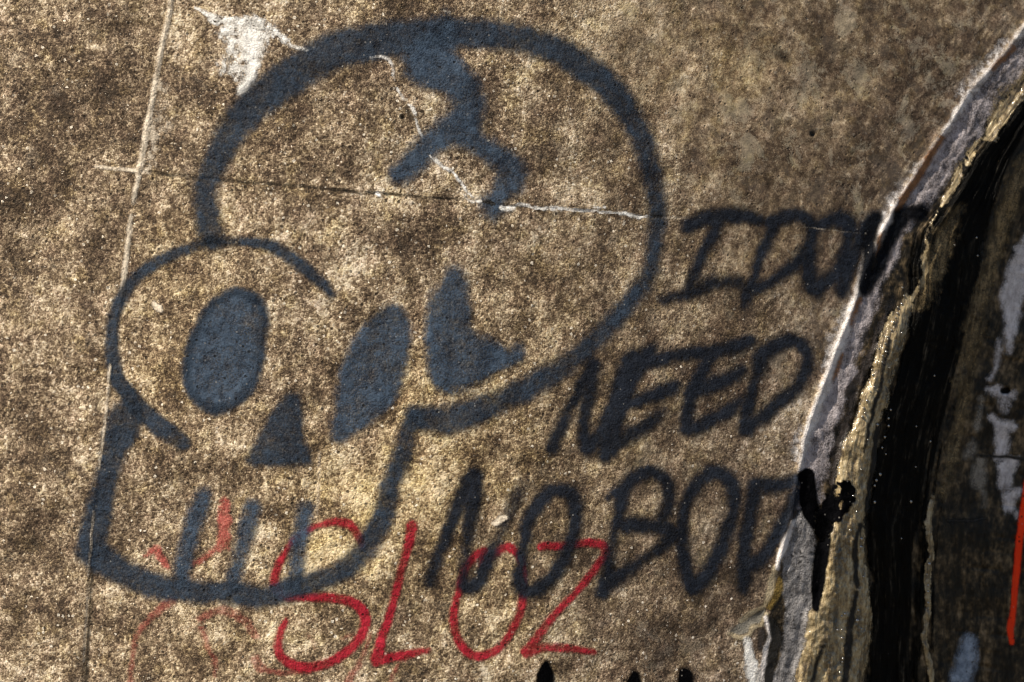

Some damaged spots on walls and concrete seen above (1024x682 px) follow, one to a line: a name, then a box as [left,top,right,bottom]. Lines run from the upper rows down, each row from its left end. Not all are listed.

crack [95,56,667,219]